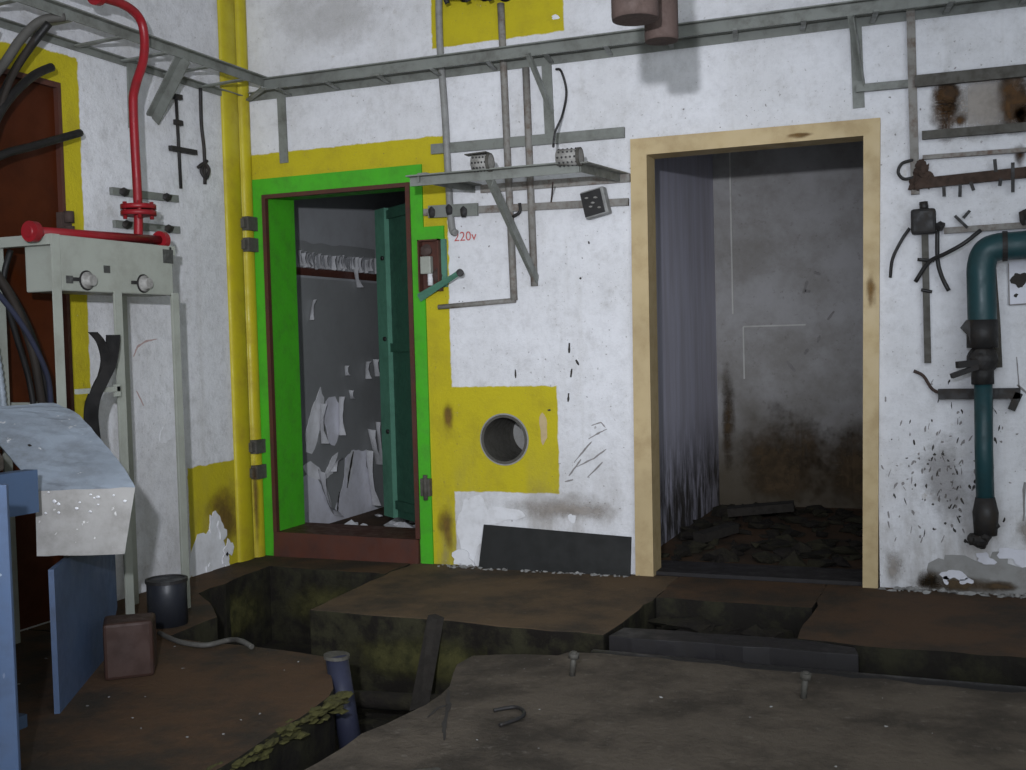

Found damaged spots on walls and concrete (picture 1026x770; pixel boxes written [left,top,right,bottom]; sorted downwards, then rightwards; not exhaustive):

rust [933,84,965,129]
rust [999,78,1026,124]
peeling [365,359,380,379]
leakage [724,382,734,459]
peeling [303,387,383,523]
leakage [747,424,863,501]
leakage [532,502,602,517]
peeling [190,511,234,577]
flaking render [920,548,1026,595]